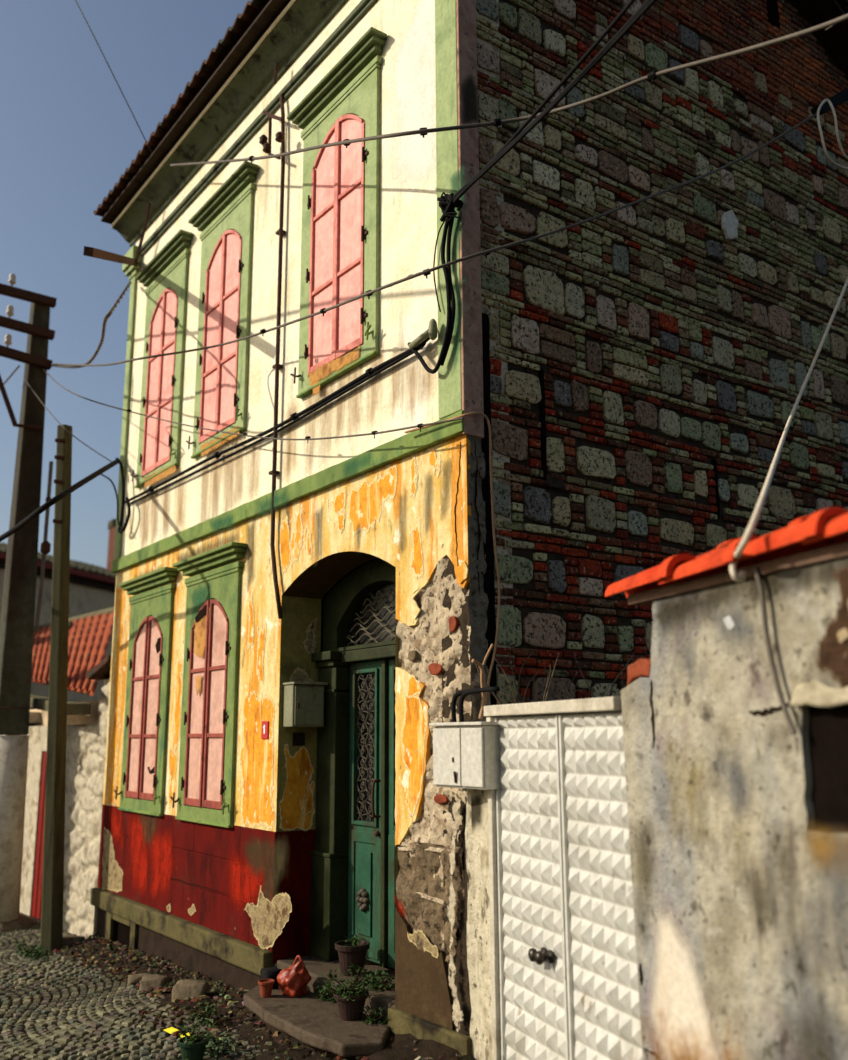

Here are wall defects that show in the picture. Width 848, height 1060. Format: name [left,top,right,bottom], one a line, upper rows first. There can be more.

damp [178,517,254,586]
peeling [266,510,314,577]
peeling [327,448,444,535]
spalling [815,567,848,688]
peeling [102,585,172,894]
peeling [239,588,315,831]
spalling [395,521,472,1032]
spalling [231,860,292,950]